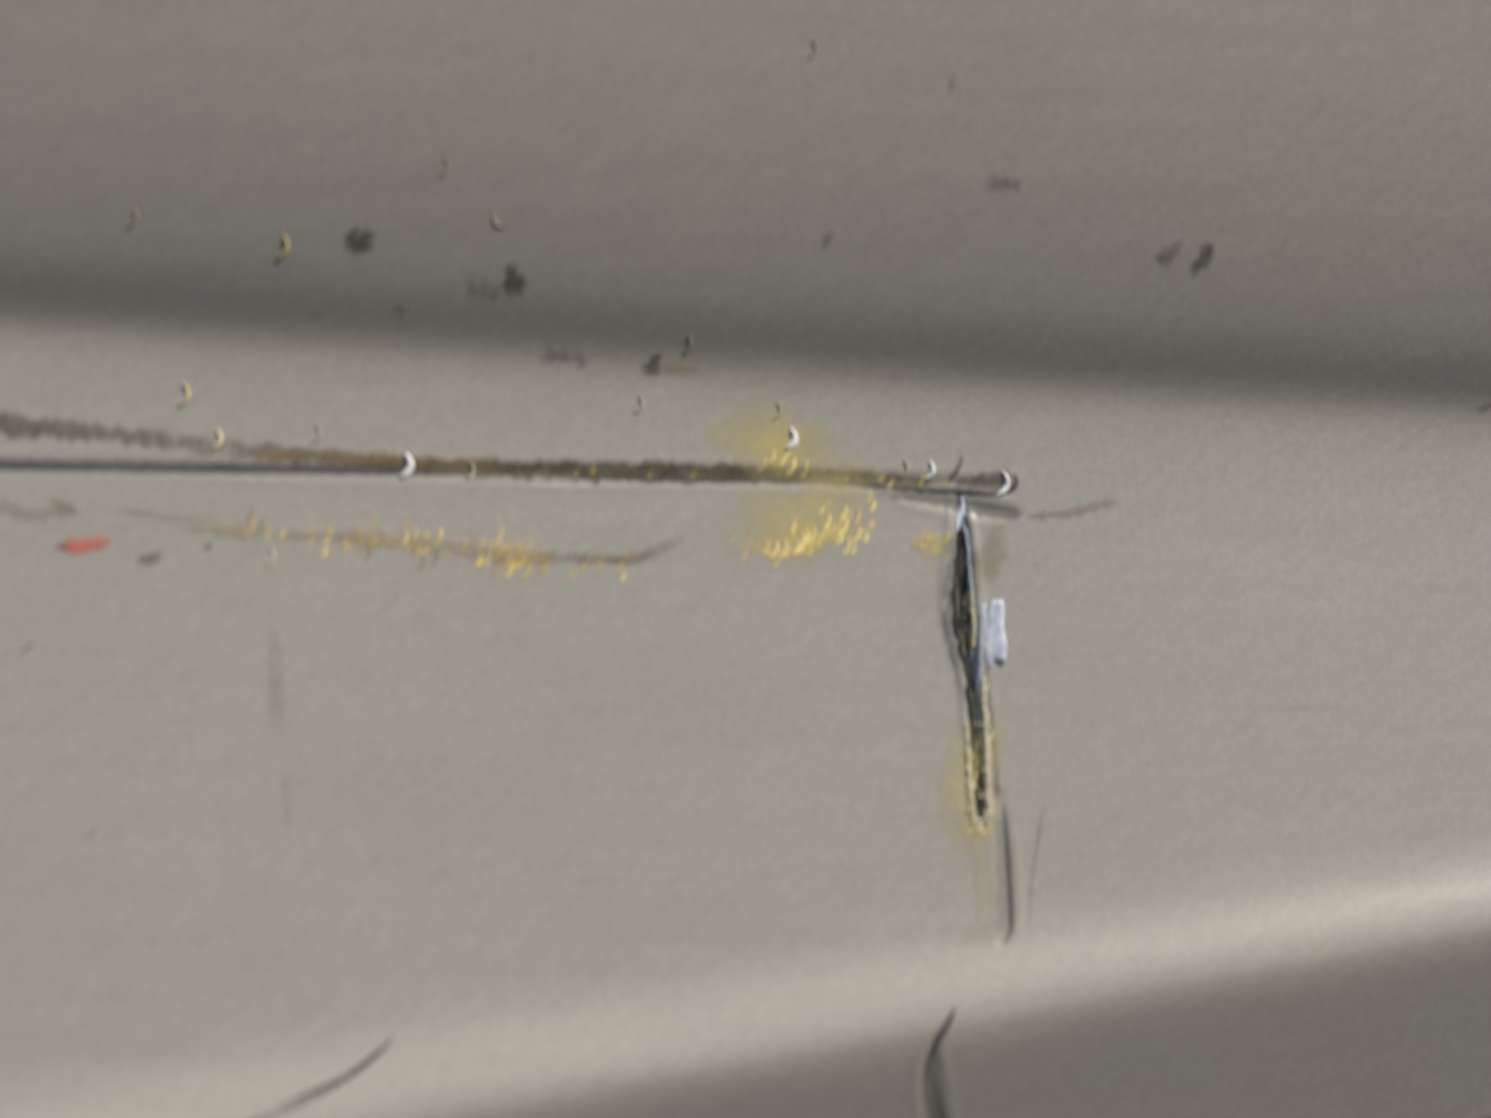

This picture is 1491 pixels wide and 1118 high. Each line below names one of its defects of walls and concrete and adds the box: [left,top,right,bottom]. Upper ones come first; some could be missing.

crack [261,1041,390,1118]